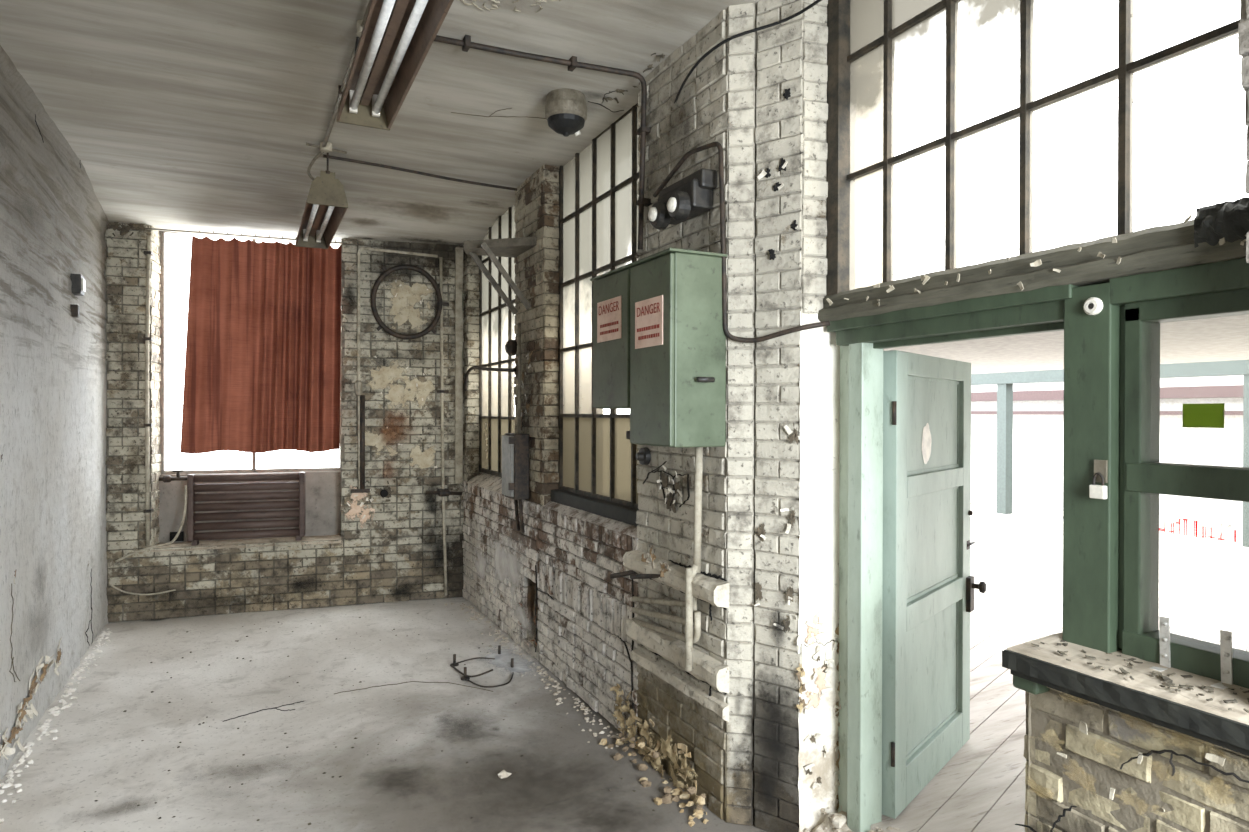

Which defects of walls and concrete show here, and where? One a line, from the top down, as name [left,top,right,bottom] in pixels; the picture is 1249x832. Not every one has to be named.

peeling [366,356,435,412]
peeling [365,427,438,470]
spalling [784,423,801,445]
peeling [345,481,393,529]
spalling [756,523,767,542]
spalling [780,508,796,534]
spalling [754,582,763,606]
peeling [773,586,841,810]
spalling [610,683,707,815]
leakage [764,703,784,759]
crack [1120,749,1249,783]
crack [1015,806,1077,832]